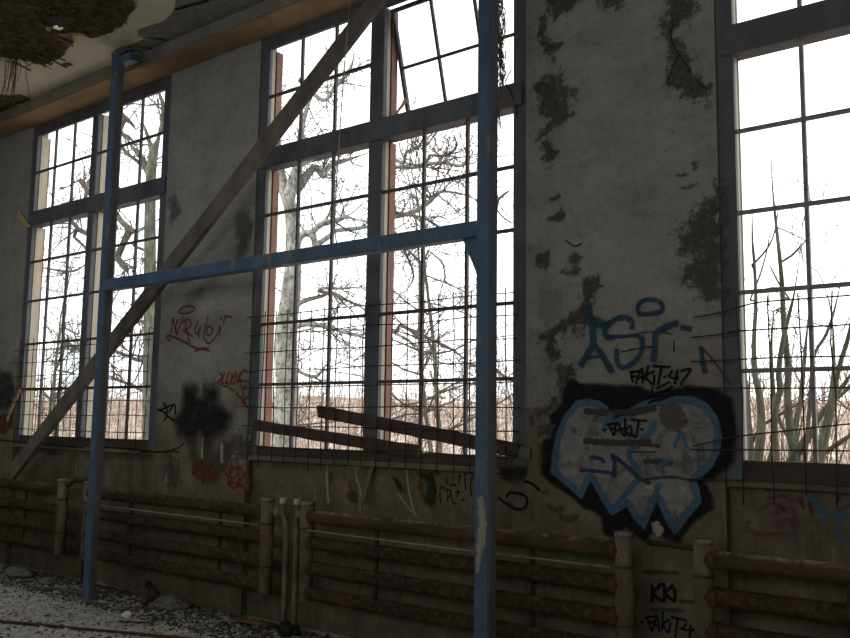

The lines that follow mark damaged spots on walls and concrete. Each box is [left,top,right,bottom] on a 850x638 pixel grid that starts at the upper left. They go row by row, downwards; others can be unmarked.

spalling [533,0,580,162]
spalling [659,0,715,106]
crack [667,19,708,90]
spalling [668,178,730,315]
spalling [527,250,603,440]